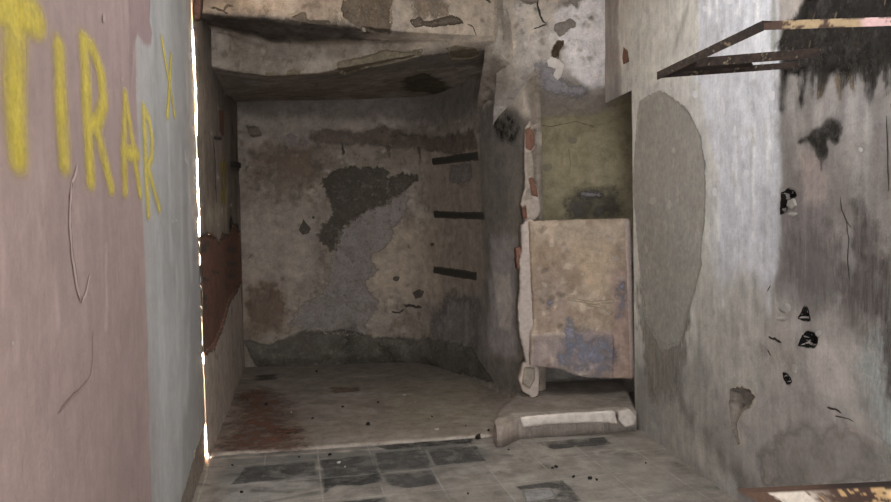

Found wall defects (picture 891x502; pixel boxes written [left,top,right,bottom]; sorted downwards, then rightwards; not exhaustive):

peeling [291,11,332,25]
peeling [340,0,393,35]
peeling [332,48,423,75]
peeling [547,18,576,80]
leakage [781,0,814,43]
leakage [779,43,891,111]
crack [69,165,90,302]
flaking render [200,215,242,356]
peeling [287,165,419,337]
flaking render [514,219,540,397]
leakage [789,200,891,397]
crack [59,334,93,413]